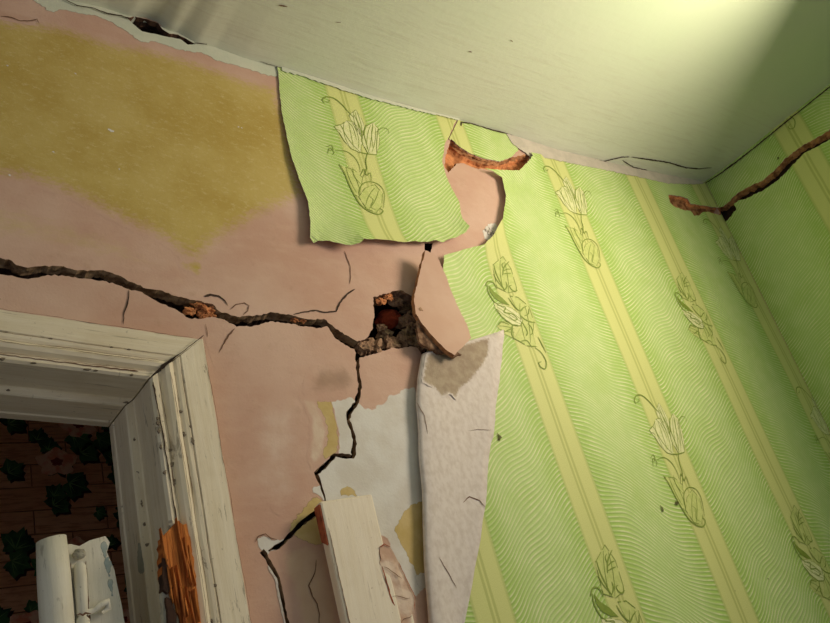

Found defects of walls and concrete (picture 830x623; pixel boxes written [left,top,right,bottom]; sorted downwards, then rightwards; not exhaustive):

crack [601,86,830,183]
crack [669,130,830,222]
crack [425,243,433,252]
spalling [483,223,497,240]
crack [376,293,393,306]
flaking render [353,250,471,361]
leakage [421,336,491,400]
crack [0,251,362,623]
flaking render [258,386,426,623]